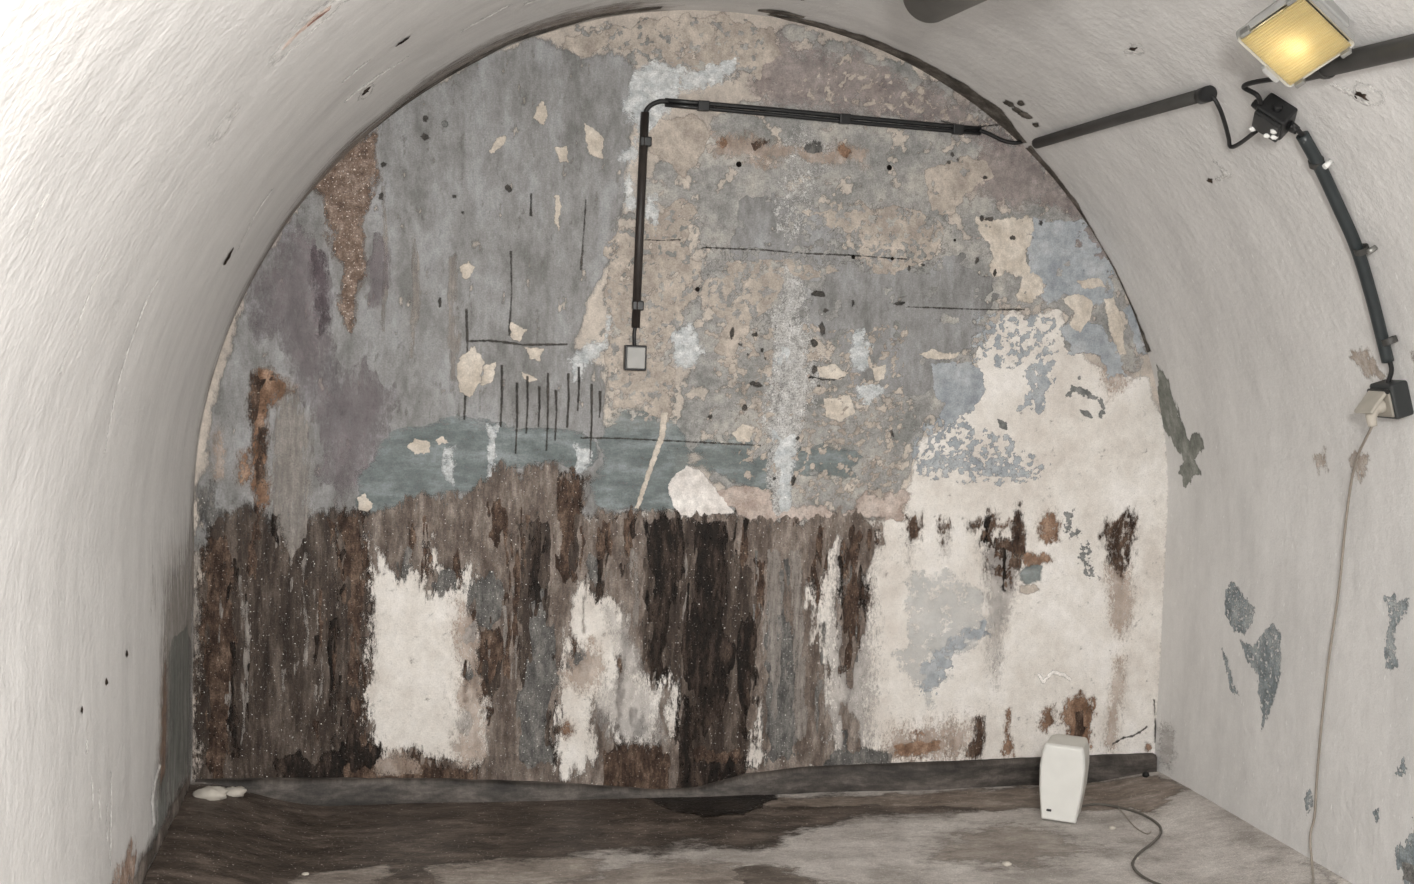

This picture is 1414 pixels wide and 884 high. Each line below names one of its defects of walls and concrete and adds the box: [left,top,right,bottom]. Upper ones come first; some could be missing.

damp [749,32,1107,259]
damp [133,3,978,884]
peeling [194,11,1204,782]
damp [905,502,1062,594]
damp [1105,657,1125,751]
damp [1099,506,1139,634]
peeling [1223,581,1281,730]
peeling [1383,593,1409,670]
damp [930,822,1083,871]
peeling [1395,817,1414,884]